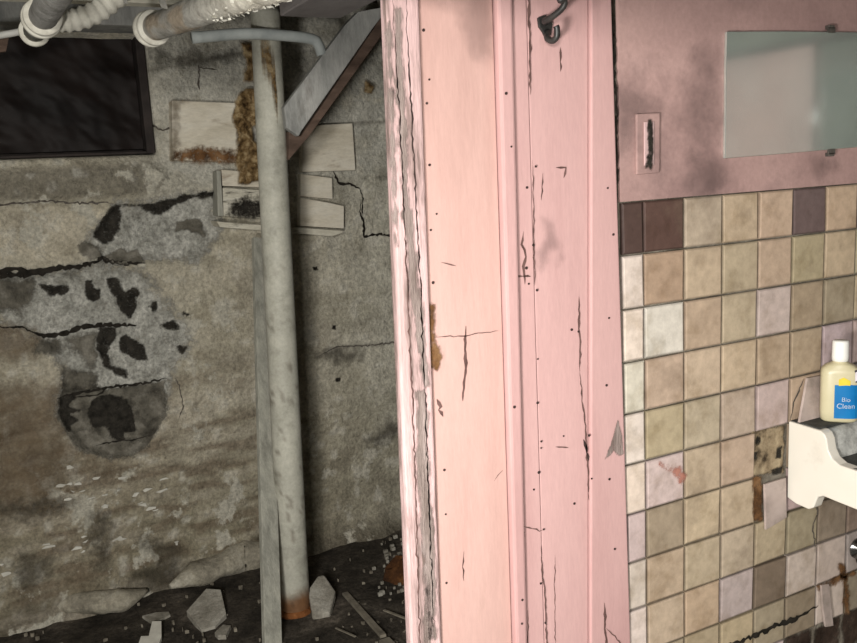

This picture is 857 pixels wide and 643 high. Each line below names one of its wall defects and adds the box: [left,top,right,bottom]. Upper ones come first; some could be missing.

peeling [207,0,292,23]
crack [0,256,145,279]
crack [0,322,136,339]
spalling [0,191,223,459]
crack [318,1,494,643]
spalling [798,375,820,423]
peeling [751,425,787,530]
crack [730,606,818,643]